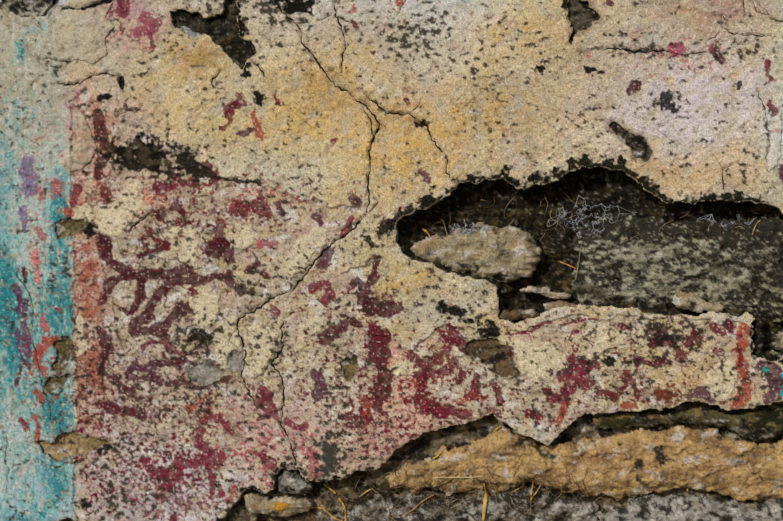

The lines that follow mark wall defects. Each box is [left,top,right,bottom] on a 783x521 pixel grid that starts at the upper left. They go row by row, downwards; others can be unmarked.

spalling [0,0,52,17]
peeling [51,0,114,64]
spalling [171,0,256,70]
spalling [567,0,600,43]
crack [603,0,783,55]
spalling [55,217,88,239]
crack [231,0,453,463]
spalling [397,166,783,365]
spalling [39,335,74,394]
spalling [340,350,361,381]
spalling [465,338,520,378]
spalling [227,400,783,521]